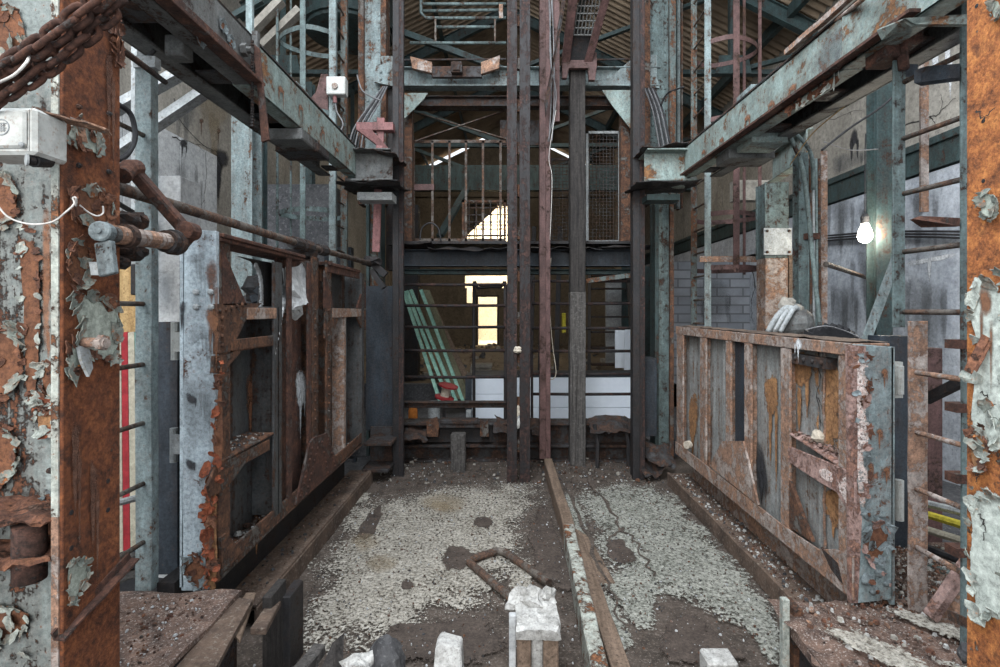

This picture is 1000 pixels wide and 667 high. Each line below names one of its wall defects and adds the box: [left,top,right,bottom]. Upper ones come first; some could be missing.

peeling [0,0,26,56]
peeling [67,113,107,158]
peeling [0,169,51,489]
peeling [64,238,124,387]
peeling [180,360,226,592]
rust [206,262,219,364]
rust [764,375,779,487]
rust [795,351,839,448]
rust [819,468,846,538]
peeling [852,351,899,570]
peeling [958,266,1000,473]
peeling [961,485,1000,628]